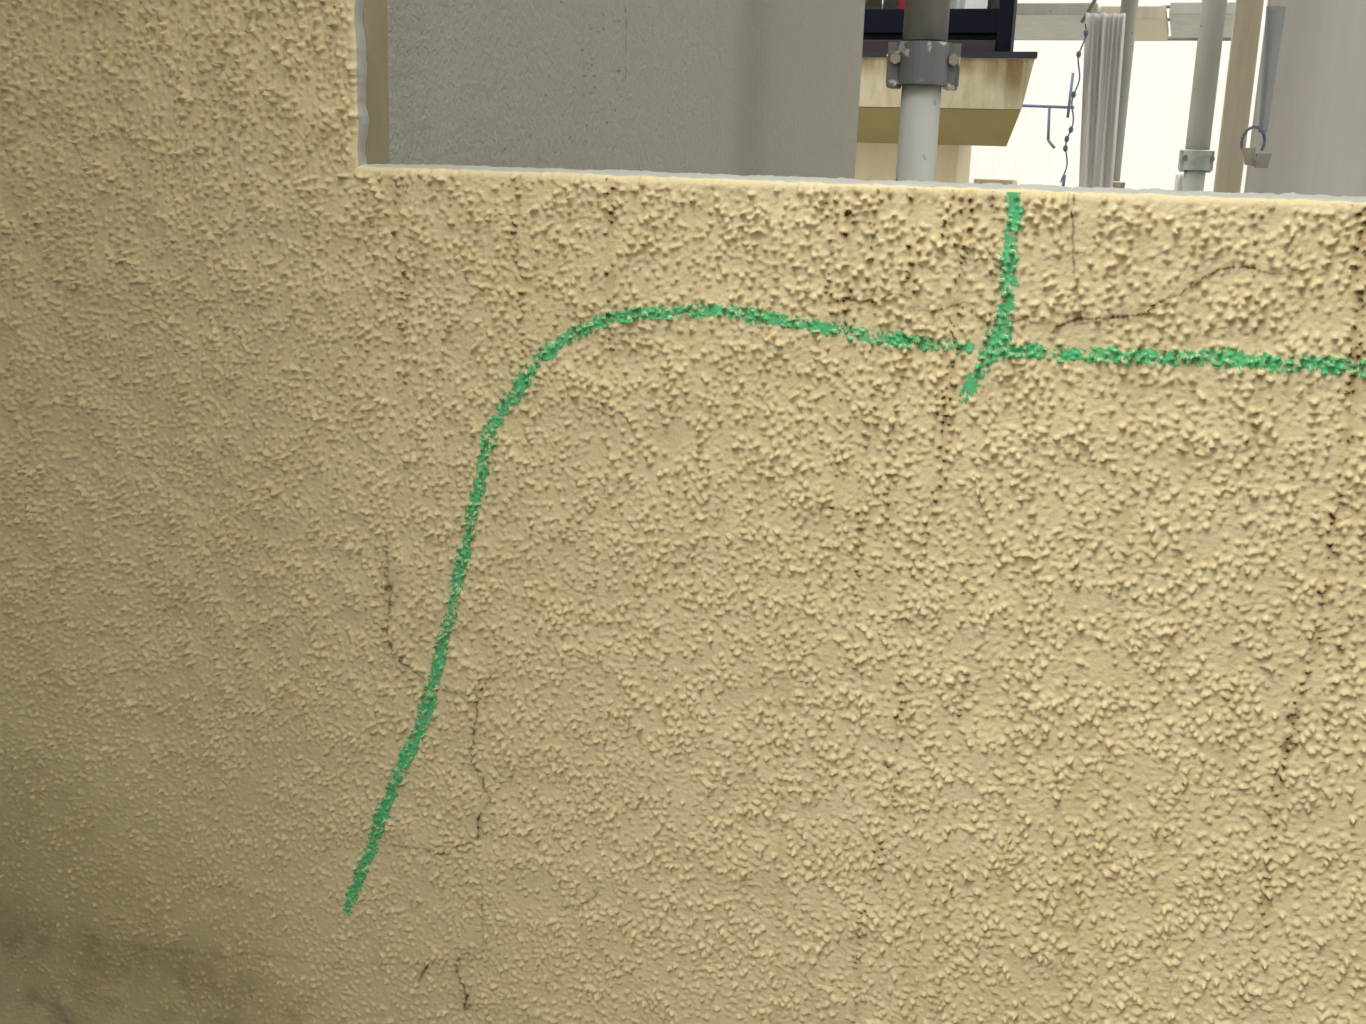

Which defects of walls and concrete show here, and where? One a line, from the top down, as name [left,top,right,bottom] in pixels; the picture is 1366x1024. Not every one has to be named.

crack [836,294,905,302]
crack [1026,265,1256,333]
water stain [1338,207,1366,394]
water stain [932,313,960,503]
water stain [1271,672,1308,797]